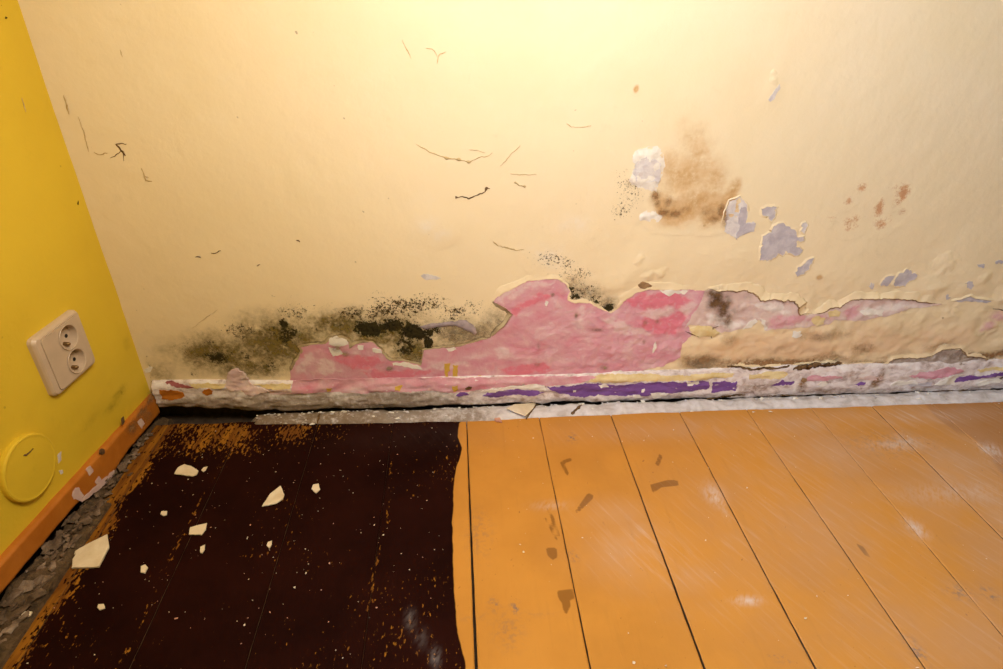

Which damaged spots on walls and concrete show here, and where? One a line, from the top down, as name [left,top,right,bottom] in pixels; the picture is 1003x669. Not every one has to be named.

damp [614,103,760,237]
damp [515,201,617,312]
peeling [721,195,815,278]
damp [173,293,491,375]
peeling [159,267,1003,423]